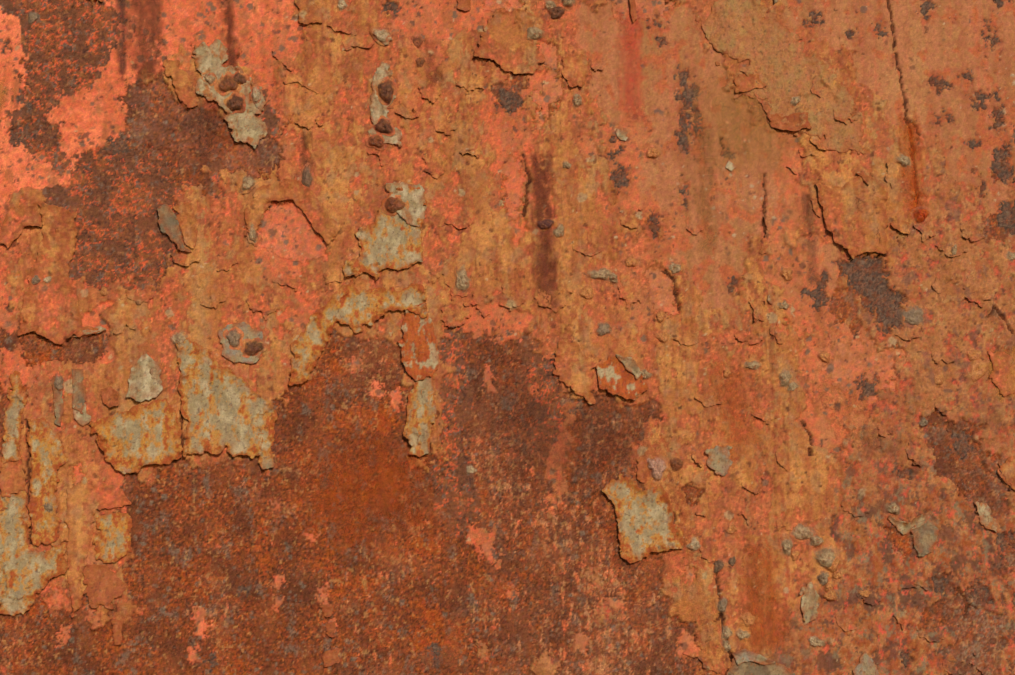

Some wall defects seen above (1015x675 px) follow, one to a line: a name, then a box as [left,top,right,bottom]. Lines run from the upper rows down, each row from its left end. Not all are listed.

spalling [8,0,104,152]
rust [119,0,160,78]
peeling [473,0,563,131]
peeling [695,0,865,157]
crack [887,0,919,200]
peeling [929,73,972,93]
peeling [972,90,1003,129]
peeling [991,145,1014,183]
spalling [0,39,795,675]
peeling [802,271,829,312]
peeling [811,170,910,452]
peeling [887,512,939,557]